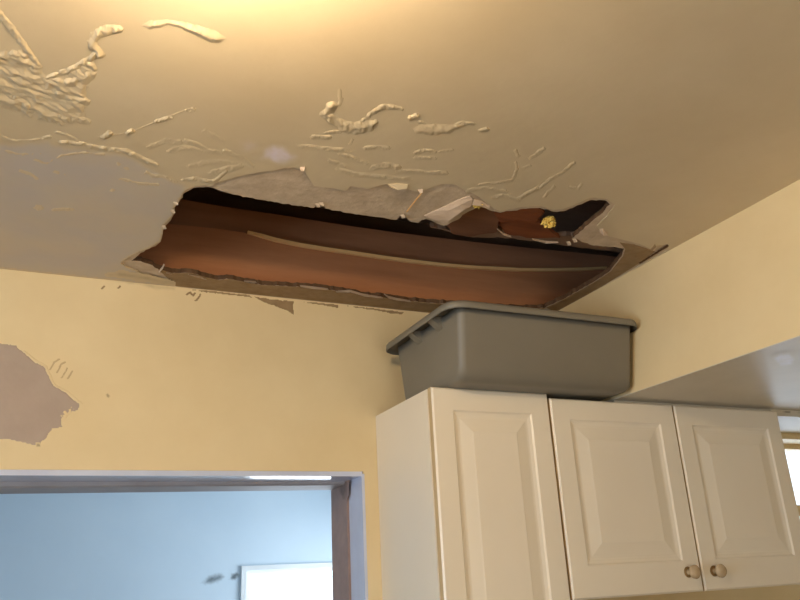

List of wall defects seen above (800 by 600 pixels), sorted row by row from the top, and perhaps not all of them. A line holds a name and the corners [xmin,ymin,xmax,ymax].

peeling [0,139,668,315]
peeling [0,343,83,447]